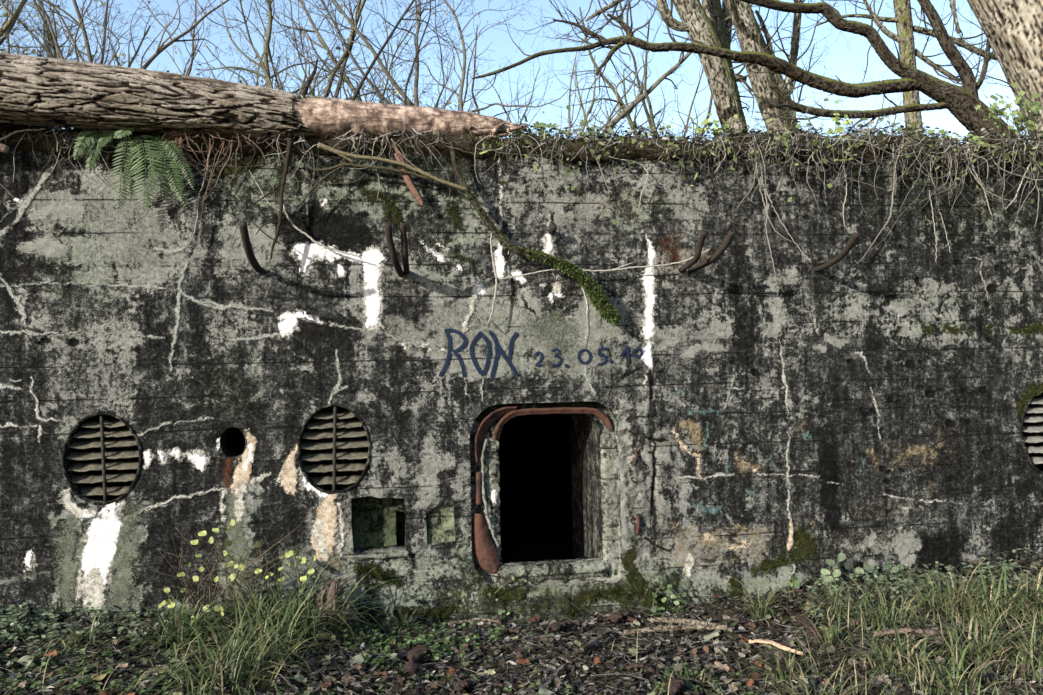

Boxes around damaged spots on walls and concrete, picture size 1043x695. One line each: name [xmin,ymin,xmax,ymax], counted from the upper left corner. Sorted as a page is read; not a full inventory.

crack [0,155,66,239]
crack [0,201,517,405]
water stain [274,196,428,358]
water stain [493,243,564,303]
water stain [541,214,555,255]
water stain [639,233,658,388]
corrosion [657,235,682,271]
crack [0,377,70,442]
crack [583,296,838,579]
water stain [62,488,126,616]
crack [124,487,227,521]
water stain [219,429,347,575]